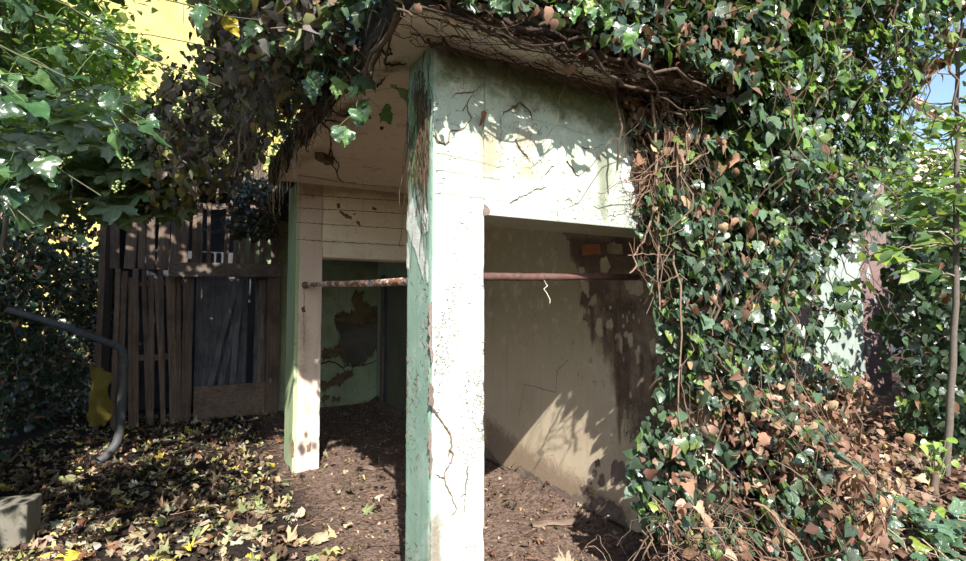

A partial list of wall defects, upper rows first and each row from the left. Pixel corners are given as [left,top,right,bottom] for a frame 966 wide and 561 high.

crack [435,108,589,201]
flaking render [320,290,377,404]
flaking render [563,153,687,470]
damp [591,307,681,438]
spalling [484,445,630,529]